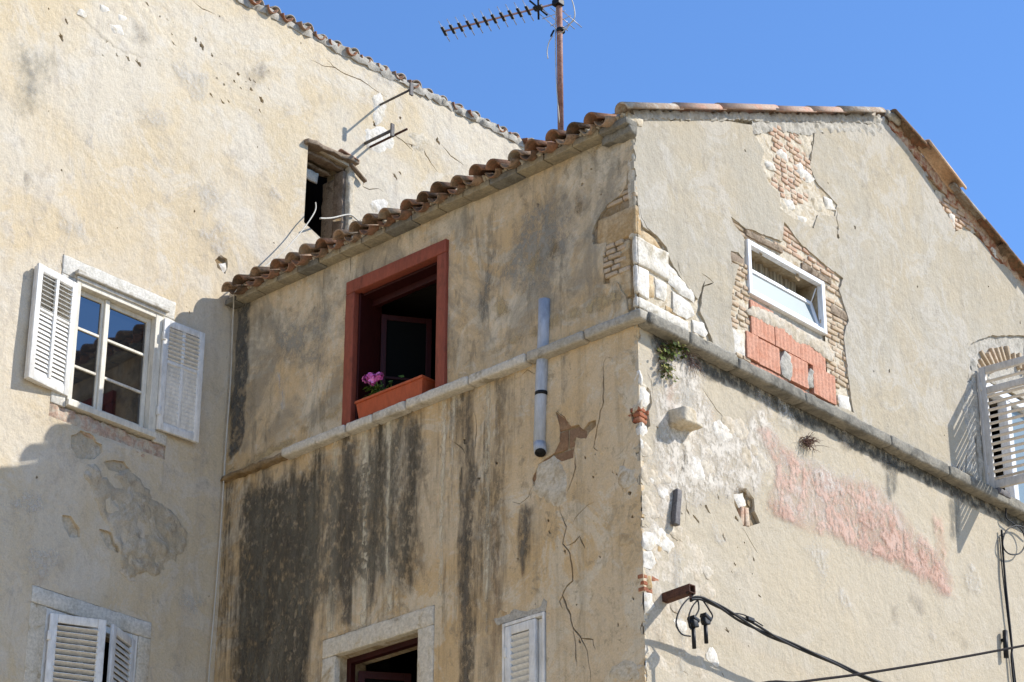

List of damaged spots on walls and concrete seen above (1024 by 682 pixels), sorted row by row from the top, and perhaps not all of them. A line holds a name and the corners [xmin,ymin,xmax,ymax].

spalling [594,138,709,341]
spalling [731,125,852,412]
spalling [935,190,1002,264]
spalling [71,431,127,473]
water stain [229,302,250,458]
water stain [233,413,422,682]
water stain [439,383,491,682]
water stain [518,507,530,571]
spalling [543,412,596,465]
peeling [628,344,950,681]
spalling [962,336,1024,480]